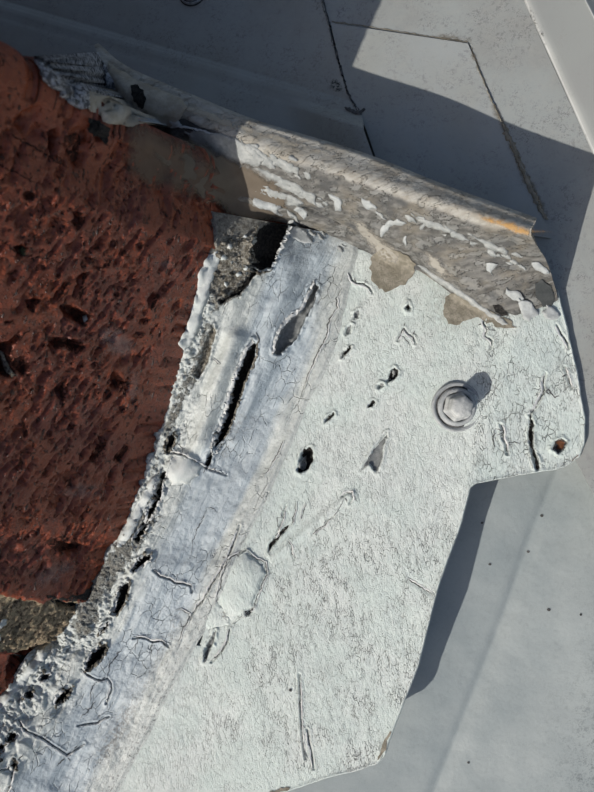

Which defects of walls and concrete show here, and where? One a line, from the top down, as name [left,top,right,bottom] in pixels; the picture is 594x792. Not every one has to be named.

peeling [184,131,342,243]
spalling [212,234,257,298]
crack [301,273,371,398]
crack [398,324,416,344]
spalling [361,198,550,292]
spalling [443,293,516,328]
spalling [361,432,387,471]
crack [492,367,573,470]
spalling [553,438,566,453]
crack [275,490,357,558]
crack [0,526,269,792]
crack [299,674,314,768]